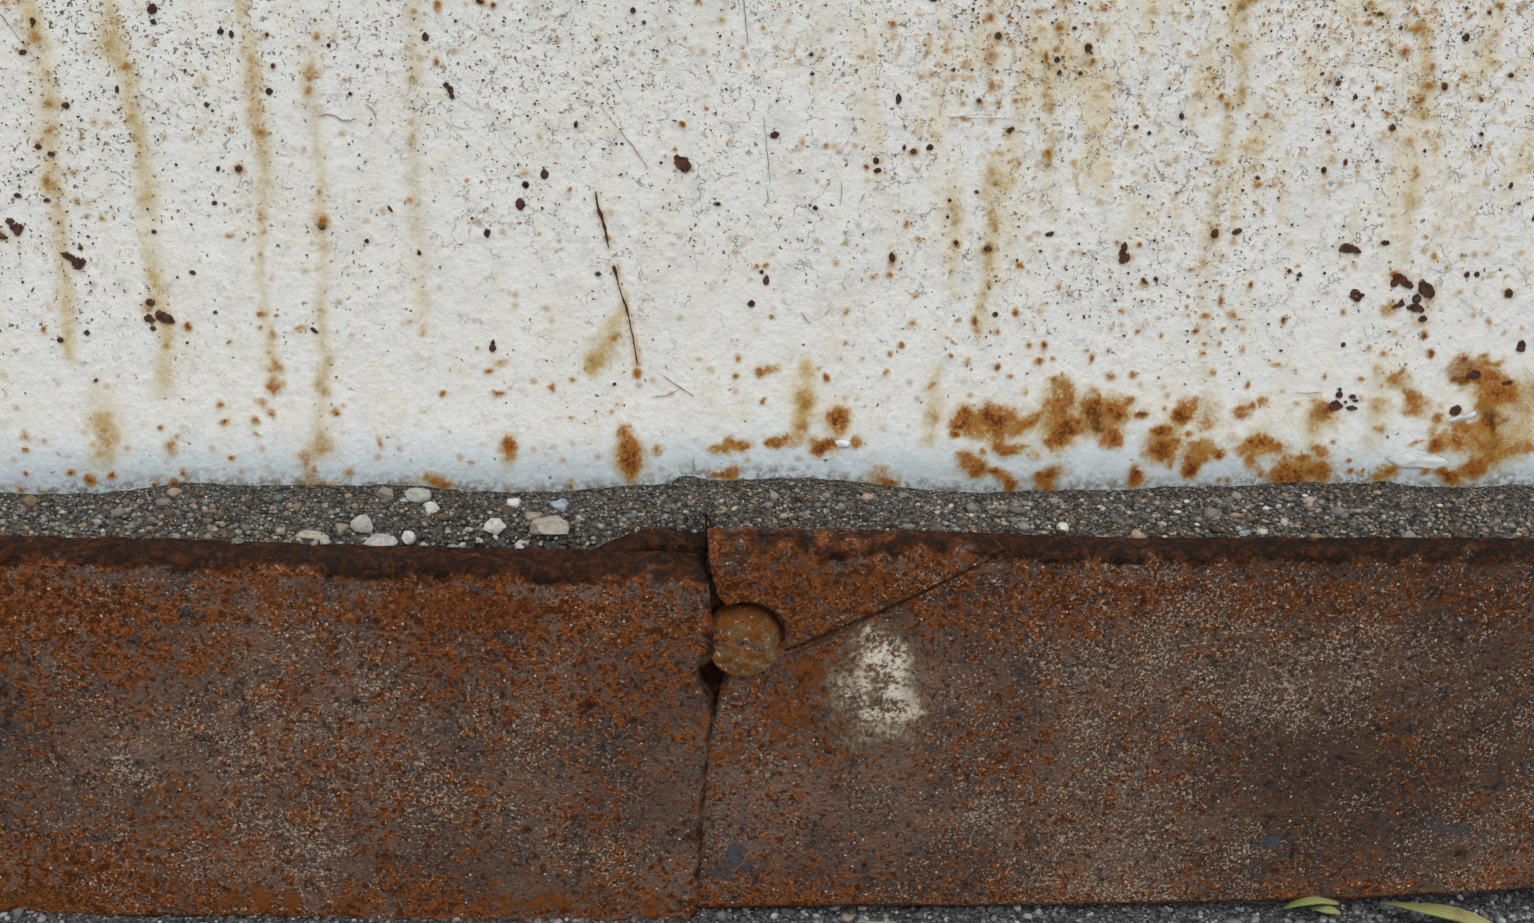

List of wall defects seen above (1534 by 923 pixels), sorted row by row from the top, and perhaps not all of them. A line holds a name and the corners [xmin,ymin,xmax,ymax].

rust [1037,8,1064,63]
rust [1390,8,1426,58]
rust [1409,66,1434,145]
rust [35,127,105,221]
rust [152,425,185,488]
rust [251,362,282,436]
rust [501,436,517,462]
rust [616,424,662,480]
rust [733,355,778,379]
rust [934,341,1398,492]
rust [1359,331,1534,487]
crack [783,537,1006,655]